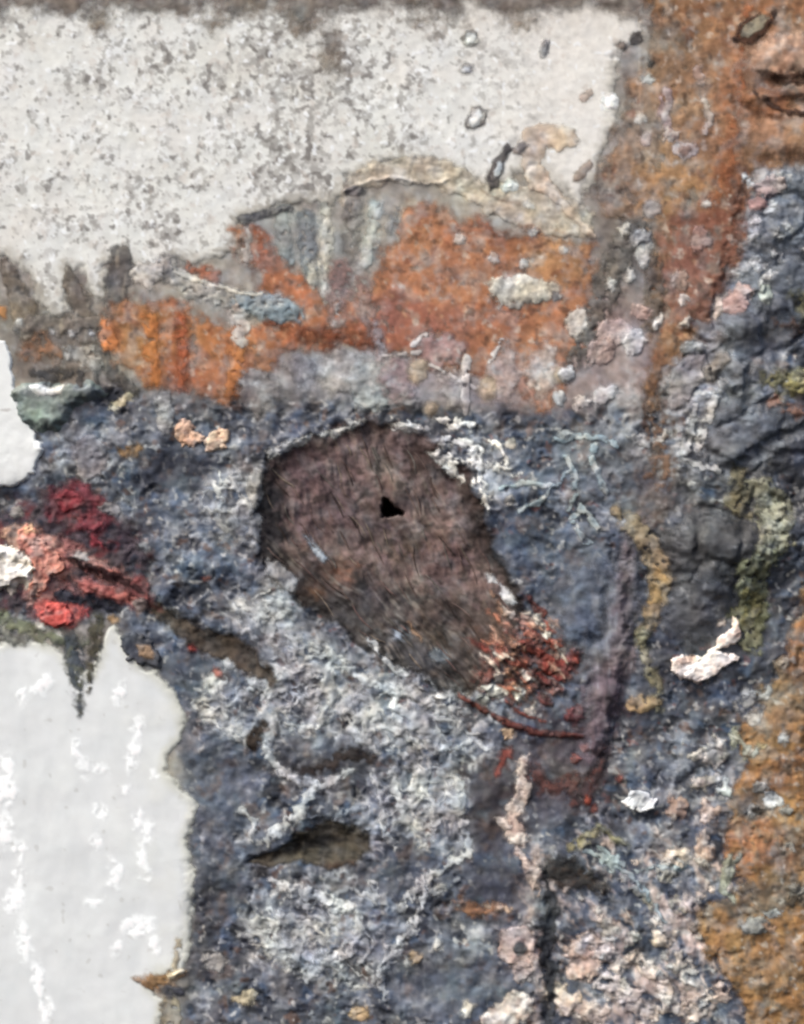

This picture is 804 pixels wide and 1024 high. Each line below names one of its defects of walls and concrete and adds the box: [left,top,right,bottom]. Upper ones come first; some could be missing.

peeling [130,261,164,290]
rust [98,201,598,413]
peeling [236,123,596,368]
peeling [461,30,479,47]
peeling [465,106,488,129]
peeling [539,39,550,58]
spalling [553,216,693,410]
rust [595,0,804,411]
spalling [690,226,713,253]
rust [120,631,162,669]
spalling [245,411,583,707]
rust [697,615,804,1024]